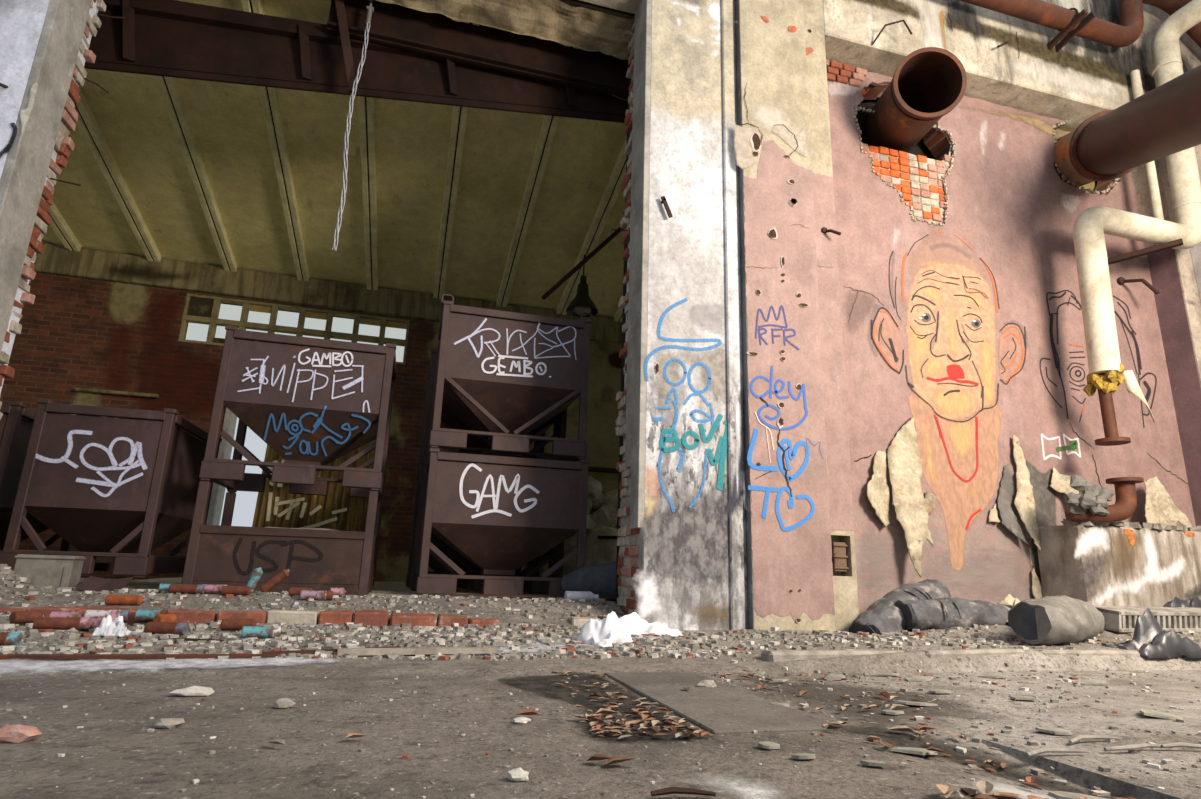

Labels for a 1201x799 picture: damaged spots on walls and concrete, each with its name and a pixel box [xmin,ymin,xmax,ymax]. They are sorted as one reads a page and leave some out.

damp [908,0,983,48]
damp [1058,0,1120,21]
damp [1014,60,1116,97]
damp [1106,47,1152,89]
flaking render [19,82,38,142]
flaking render [826,59,956,226]
peeling [867,417,937,578]
peeling [988,435,1201,599]
efflorescence [638,573,662,619]